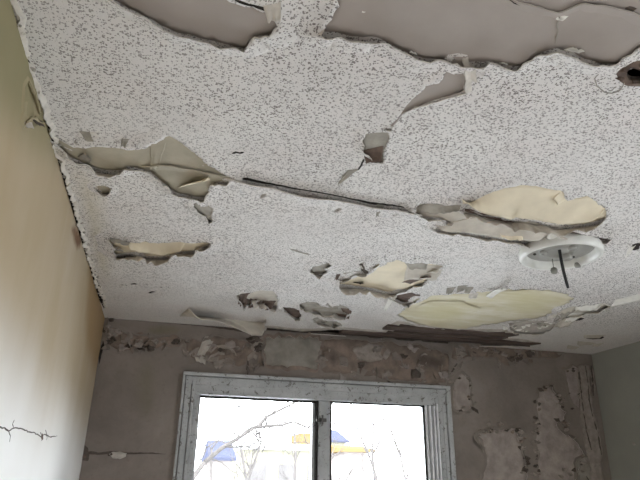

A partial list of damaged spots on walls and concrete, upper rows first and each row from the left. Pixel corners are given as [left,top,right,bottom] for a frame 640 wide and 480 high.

peeling [93,0,640,185]
peeling [20,76,247,224]
crack [222,178,422,223]
peeling [401,176,624,248]
peeling [95,231,224,266]
peeling [102,253,640,387]
crack [0,421,56,442]
crack [82,445,161,461]
flaking render [475,364,604,480]